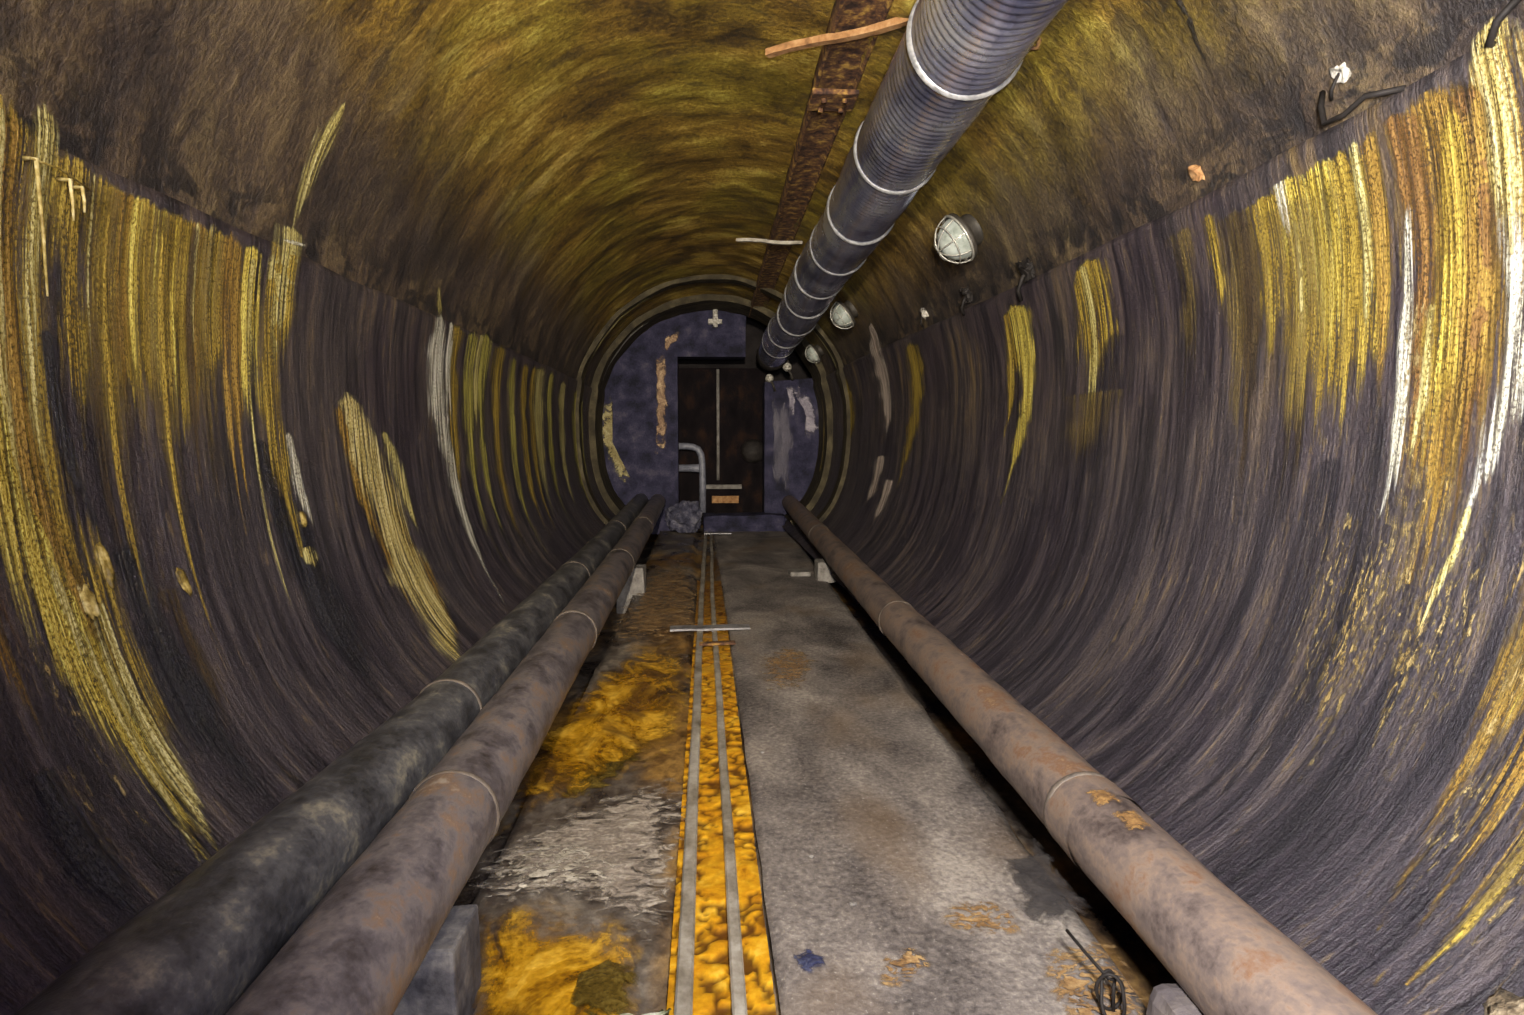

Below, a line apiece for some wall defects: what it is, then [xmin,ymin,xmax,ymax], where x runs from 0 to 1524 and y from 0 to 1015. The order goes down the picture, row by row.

damp [0,94,378,858]
damp [336,393,460,660]
damp [1004,305,1036,493]
damp [1070,258,1122,499]
damp [1178,135,1392,473]
damp [1236,458,1339,764]
damp [1410,17,1524,629]